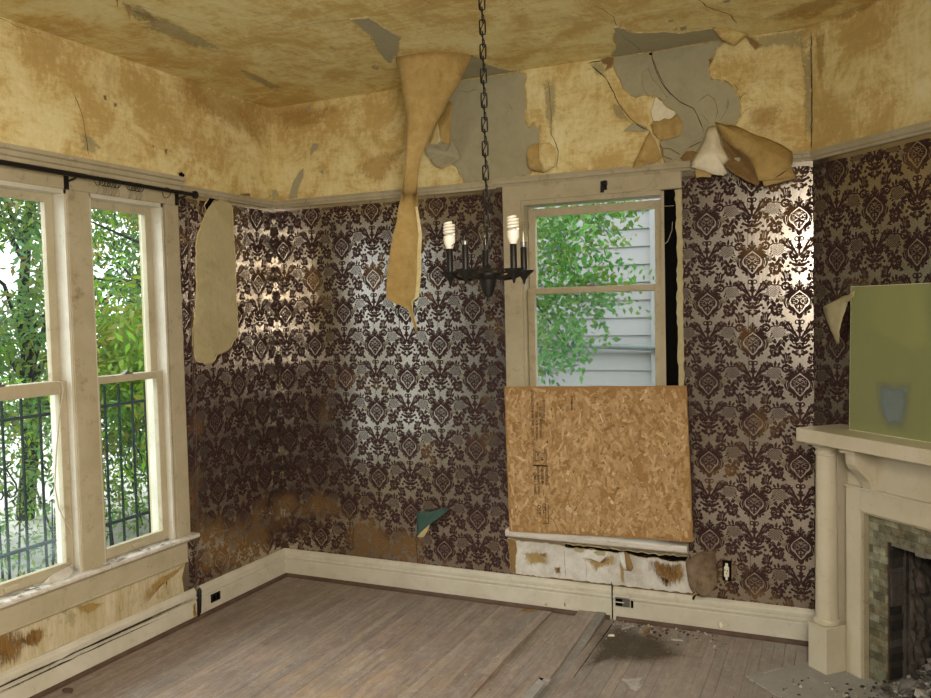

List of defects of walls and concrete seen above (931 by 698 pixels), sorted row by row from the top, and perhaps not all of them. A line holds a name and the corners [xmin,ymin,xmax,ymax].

peeling [350,16,401,70]
crack [588,60,649,131]
peeling [601,19,742,163]
crack [652,58,758,131]
peeling [192,198,238,364]
flaking render [515,540,697,600]
flaking render [0,563,185,673]
crack [574,621,614,677]